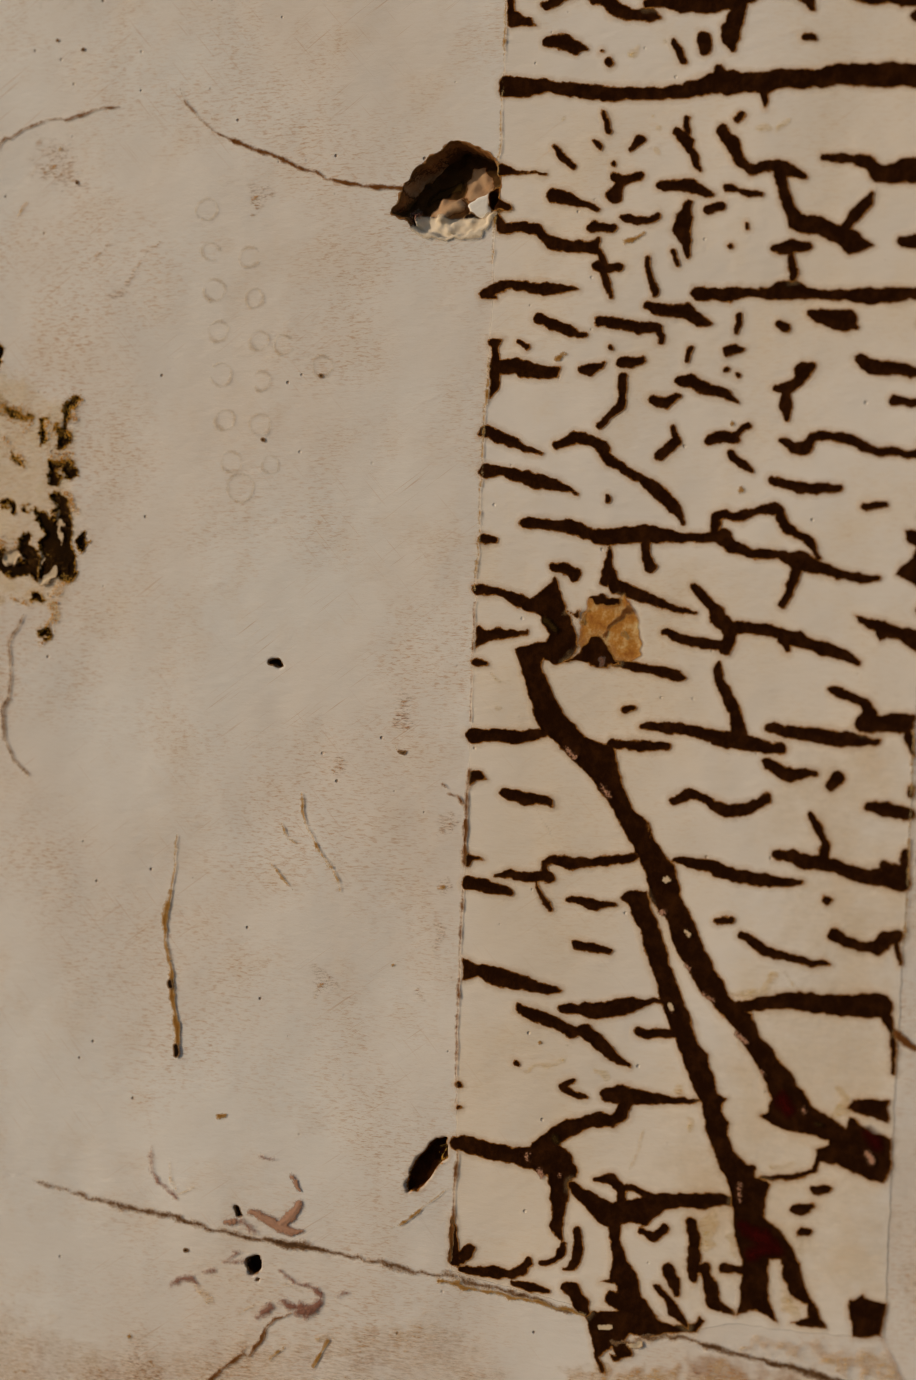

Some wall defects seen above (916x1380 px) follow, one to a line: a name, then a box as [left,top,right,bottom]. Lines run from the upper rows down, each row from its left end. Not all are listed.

crack [184,100,404,191]
spalling [0,394,92,604]
spalling [37,627,55,642]
crack [470,363,489,721]
peeling [390,0,916,1374]
crack [442,769,471,1087]
crack [903,731,915,936]
crack [38,1154,585,1316]
crack [611,1334,841,1380]